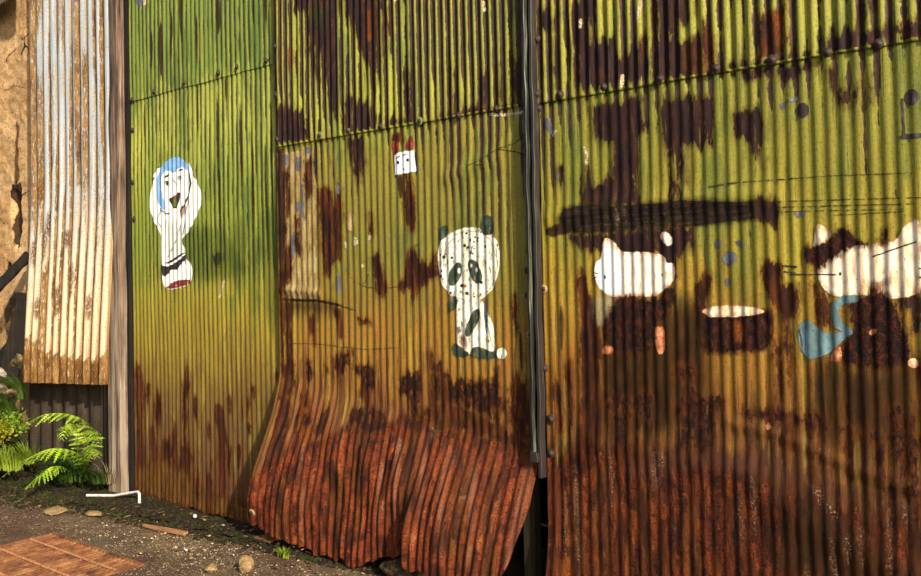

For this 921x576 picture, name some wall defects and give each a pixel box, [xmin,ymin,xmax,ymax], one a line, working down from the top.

rust [23,0,108,385]
rust [134,0,538,576]
rust [536,0,921,207]
rust [546,259,921,576]